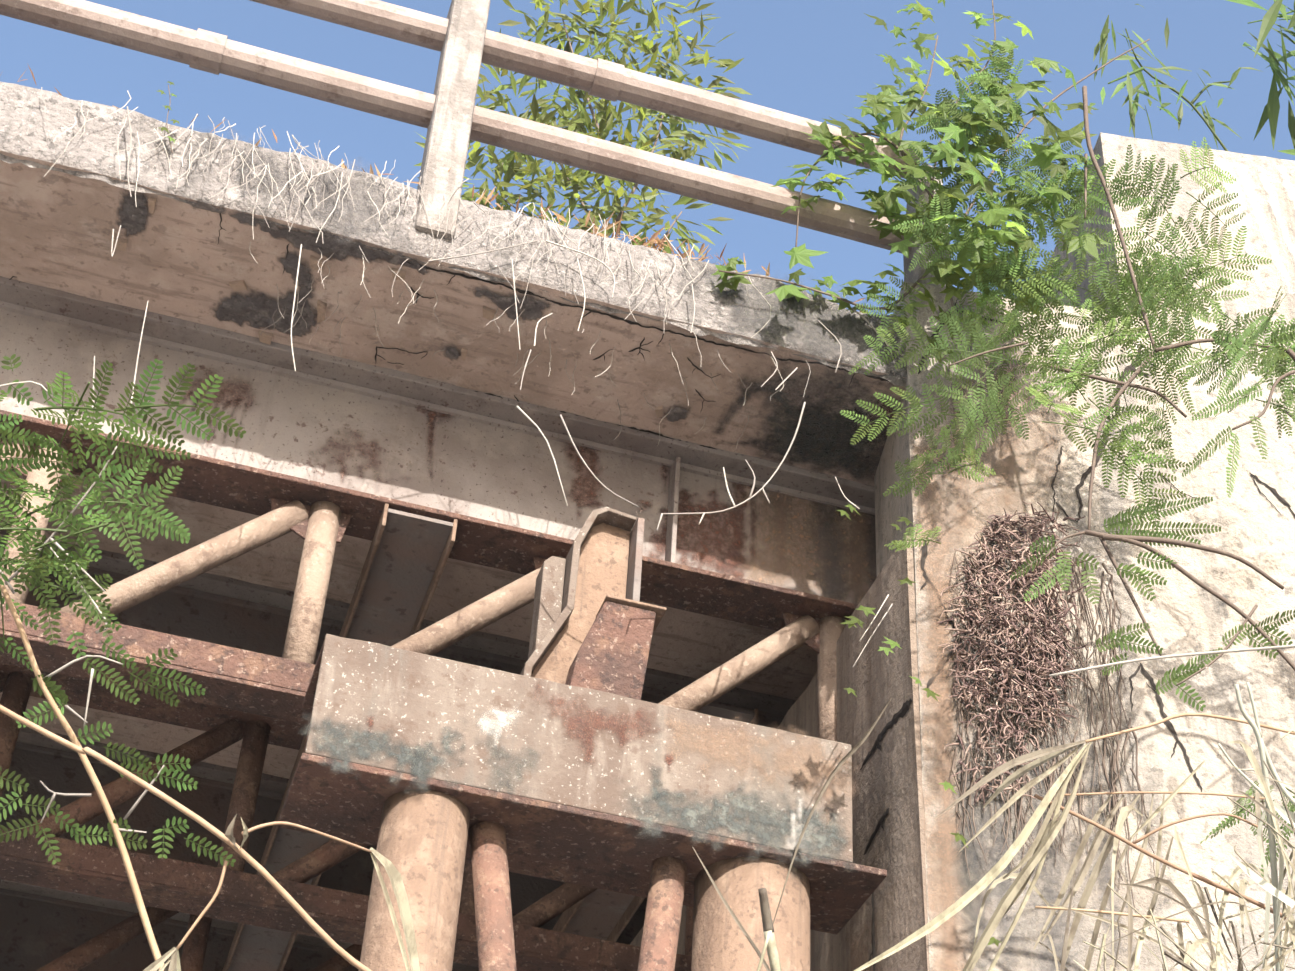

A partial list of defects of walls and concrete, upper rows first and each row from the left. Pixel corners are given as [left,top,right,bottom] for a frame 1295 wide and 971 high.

crack [375,346,428,365]
crack [405,261,1008,413]
leakage [708,271,901,480]
crack [560,411,723,451]
crack [1051,345,1150,522]
corrosion [639,484,756,578]
crack [1249,473,1295,517]
crack [860,528,976,770]
corrosion [549,699,650,757]
crack [864,808,889,855]